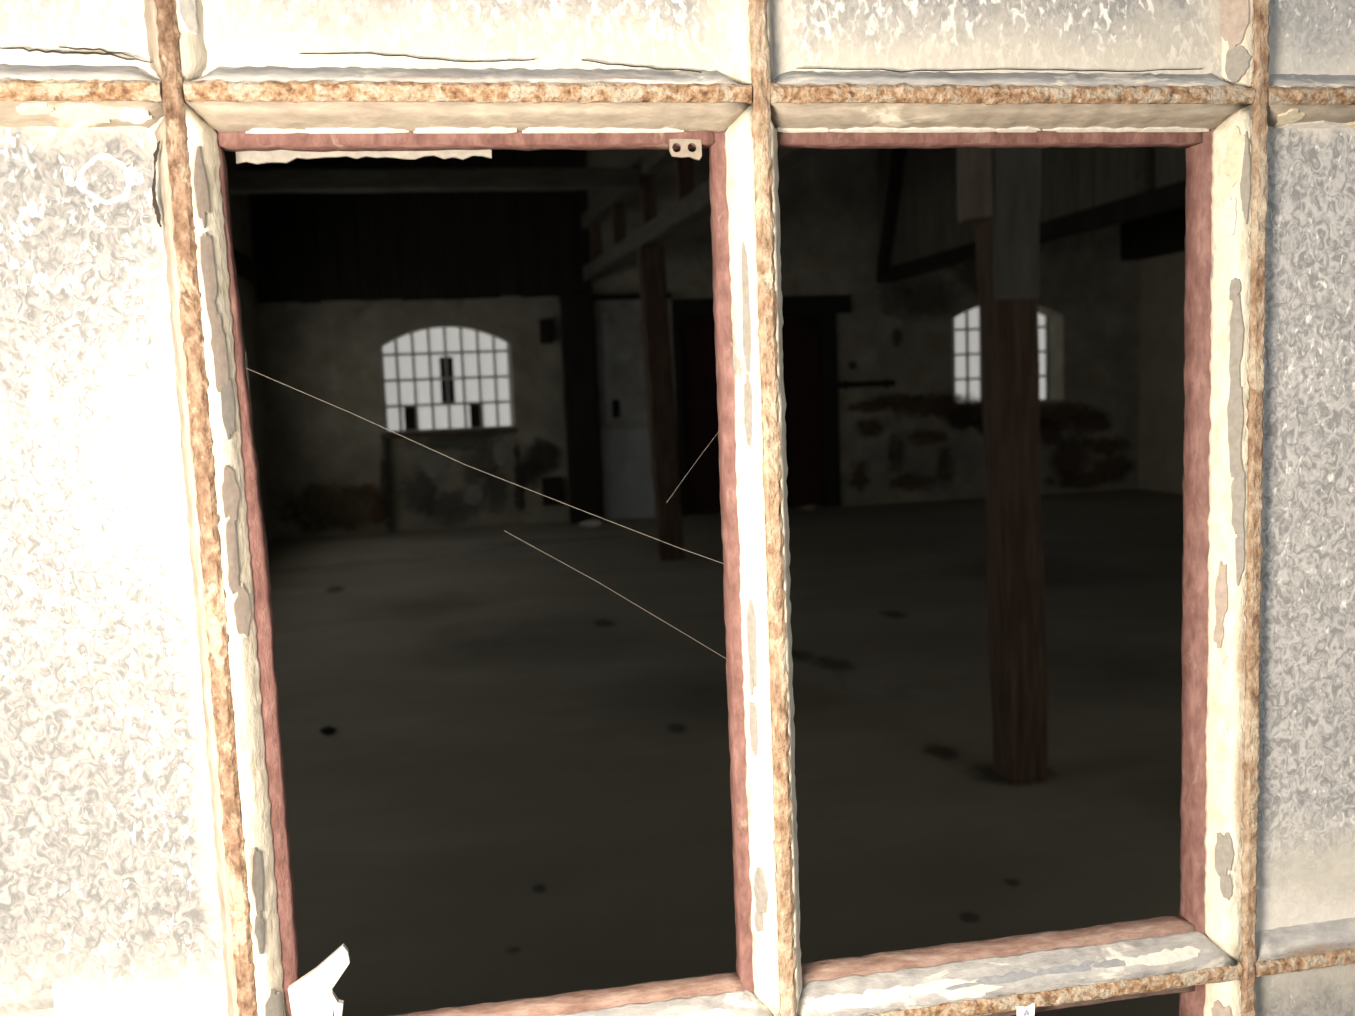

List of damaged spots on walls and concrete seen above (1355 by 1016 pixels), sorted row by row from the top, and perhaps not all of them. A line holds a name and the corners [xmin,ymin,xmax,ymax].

peeling [190,146,235,440]
peeling [1213,278,1246,648]
peeling [219,465,251,637]
peeling [747,600,758,756]
peeling [753,867,768,932]
peeling [1215,832,1235,901]
peeling [700,1008,733,1016]
peeling [806,946,1200,1012]